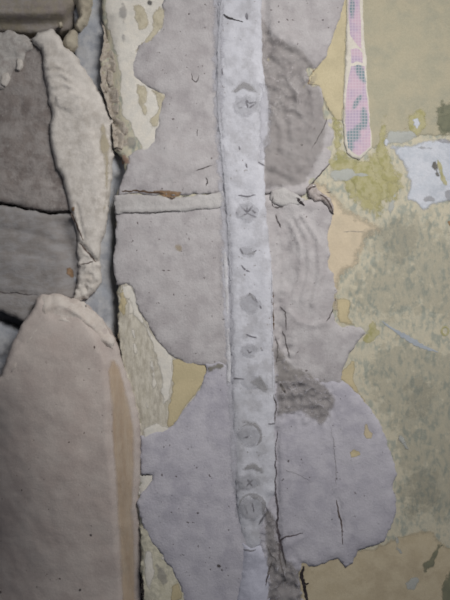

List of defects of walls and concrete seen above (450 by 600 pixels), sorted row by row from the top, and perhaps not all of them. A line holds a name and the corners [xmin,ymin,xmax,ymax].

peeling [99,0,165,152]
peeling [309,0,347,121]
peeling [363,0,450,210]
crack [0,202,96,265]
corrosion [154,191,186,199]
peeling [306,183,380,289]
peeling [118,284,207,437]
crack [271,295,290,362]
peeling [139,525,184,600]
crack [266,383,309,600]
crack [335,500,343,544]
peeling [298,531,450,600]